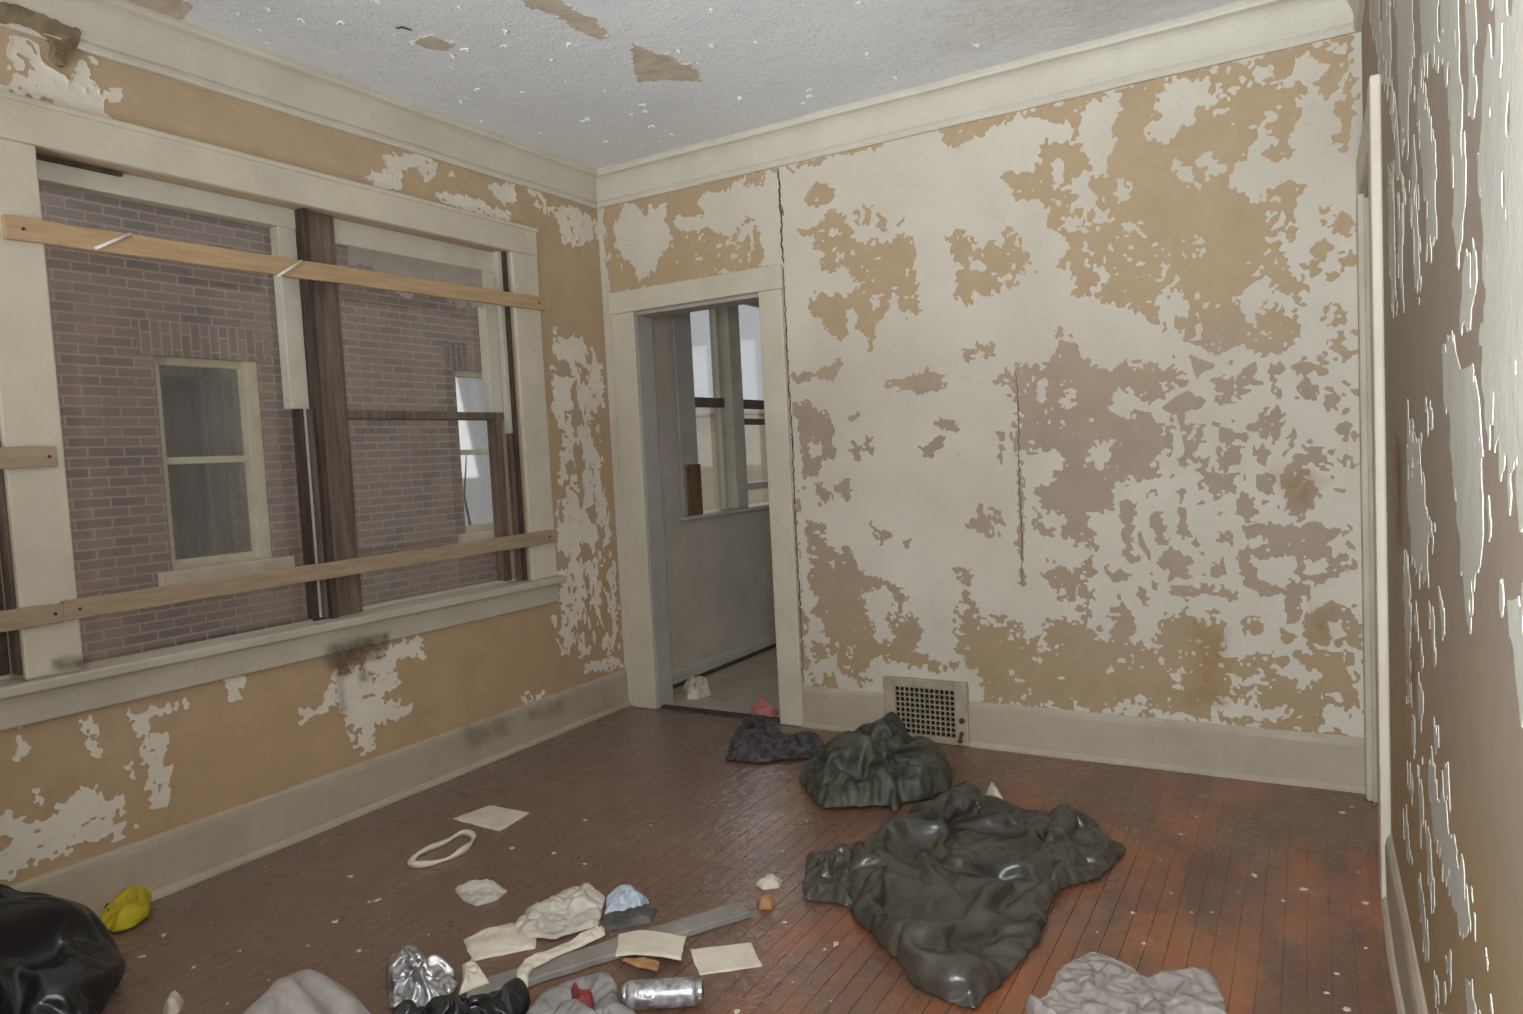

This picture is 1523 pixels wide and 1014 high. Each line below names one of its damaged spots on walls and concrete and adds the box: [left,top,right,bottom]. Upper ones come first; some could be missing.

peeling [0,2,124,119]
spalling [522,0,609,63]
peeling [365,34,1364,736]
peeling [1368,0,1523,1014]
peeling [223,676,246,702]
peeling [298,635,427,756]
peeling [0,697,190,881]